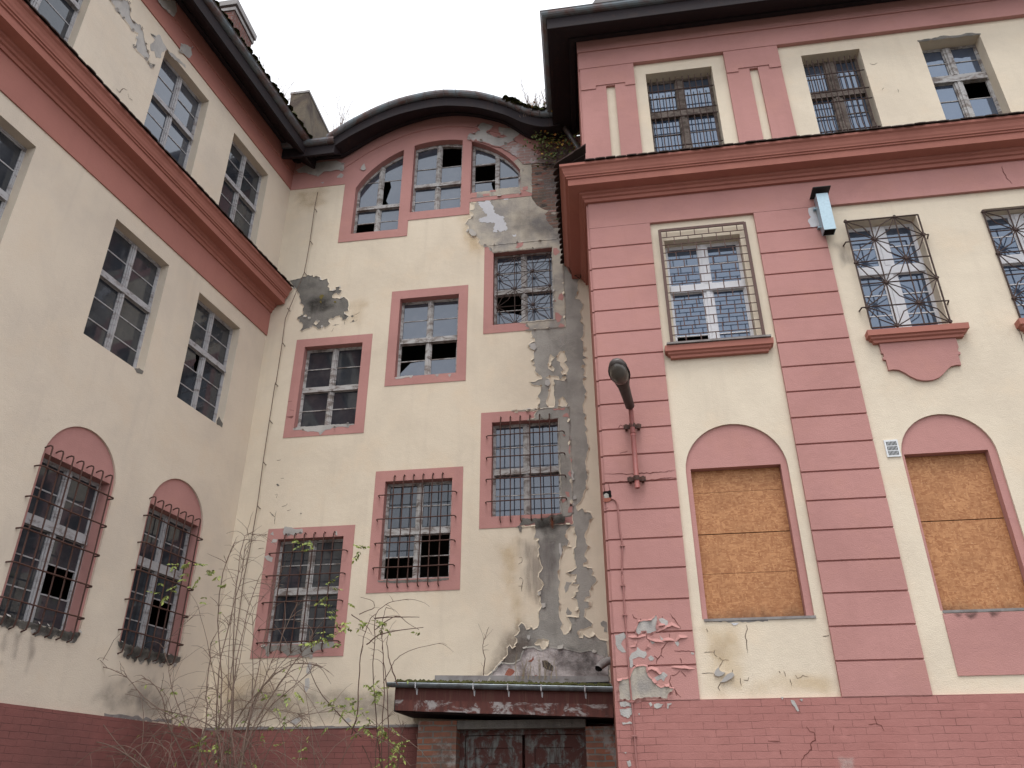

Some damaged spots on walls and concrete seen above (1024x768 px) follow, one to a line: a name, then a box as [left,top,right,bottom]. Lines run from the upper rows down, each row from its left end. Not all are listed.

peeling [110,0,193,69]
peeling [289,274,358,332]
peeling [465,122,679,725]
crack [603,425,673,510]